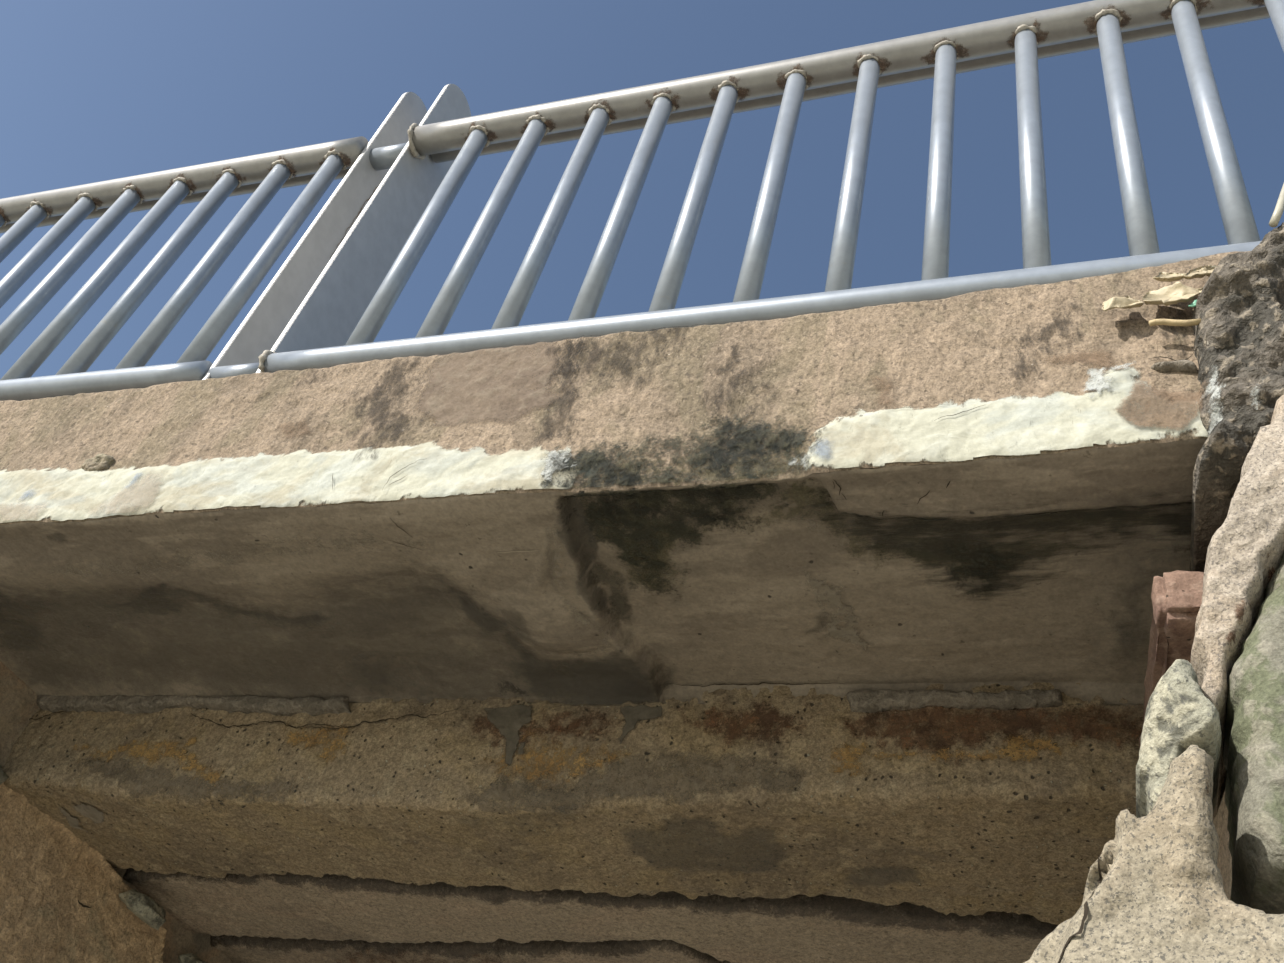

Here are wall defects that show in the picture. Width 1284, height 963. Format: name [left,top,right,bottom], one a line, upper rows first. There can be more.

spalling [1116,360,1203,430]
peeling [81,453,116,472]
water stain [559,496,634,620]
corrosion [681,698,812,751]
corrosion [842,705,1143,766]
crack [1058,853,1102,963]